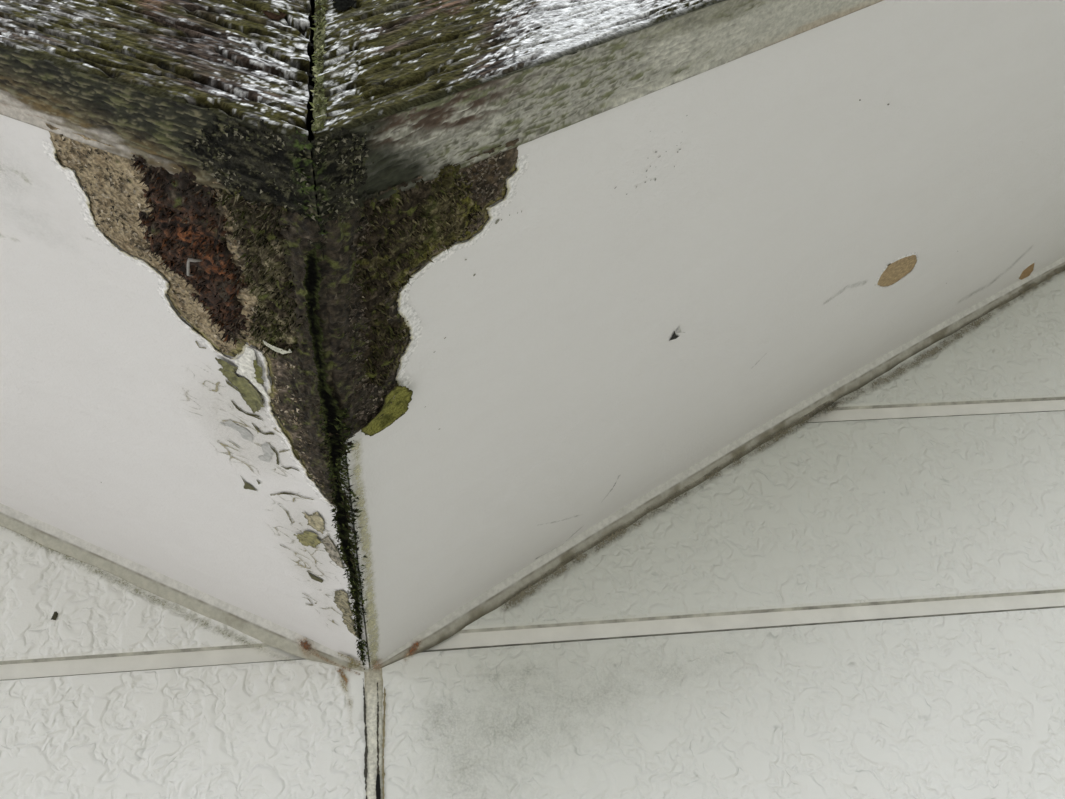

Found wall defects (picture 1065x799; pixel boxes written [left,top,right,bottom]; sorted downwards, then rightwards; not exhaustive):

peeling [875,252,919,288]
peeling [1016,260,1036,281]
peeling [41,123,529,583]
water stain [352,443,378,668]
peeling [302,589,357,637]